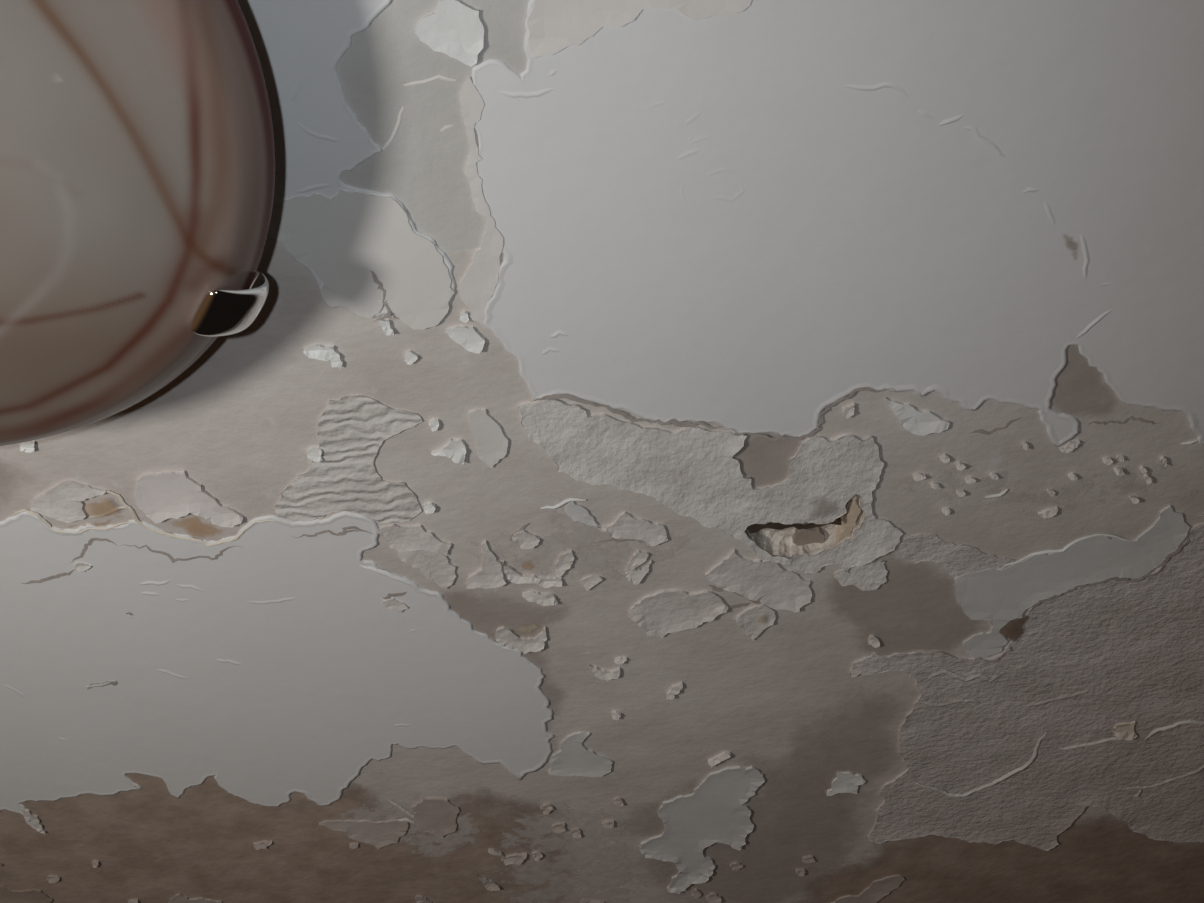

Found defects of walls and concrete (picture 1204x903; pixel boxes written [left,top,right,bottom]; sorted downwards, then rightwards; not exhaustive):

peeling [329,0,534,255]
crack [22,538,241,584]
peeling [0,232,1204,903]
water stain [0,773,568,903]
water stain [811,818,1204,903]